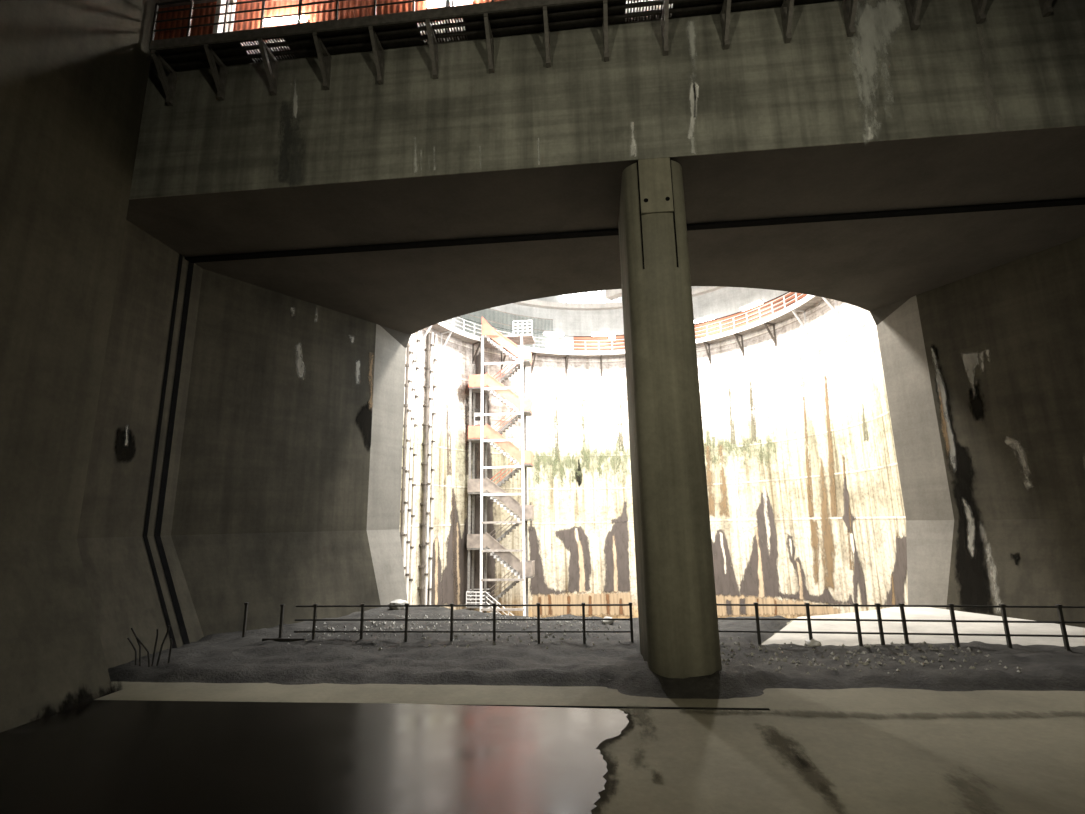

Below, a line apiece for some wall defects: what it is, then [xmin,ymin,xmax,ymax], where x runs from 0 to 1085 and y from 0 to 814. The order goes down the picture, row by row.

water stain [852,0,902,140]
water stain [474,352,485,374]
water stain [446,383,492,481]
water stain [553,394,602,486]
water stain [711,376,867,605]
water stain [427,488,496,605]
water stain [528,521,591,595]
water stain [604,501,631,593]
water stain [884,517,907,605]